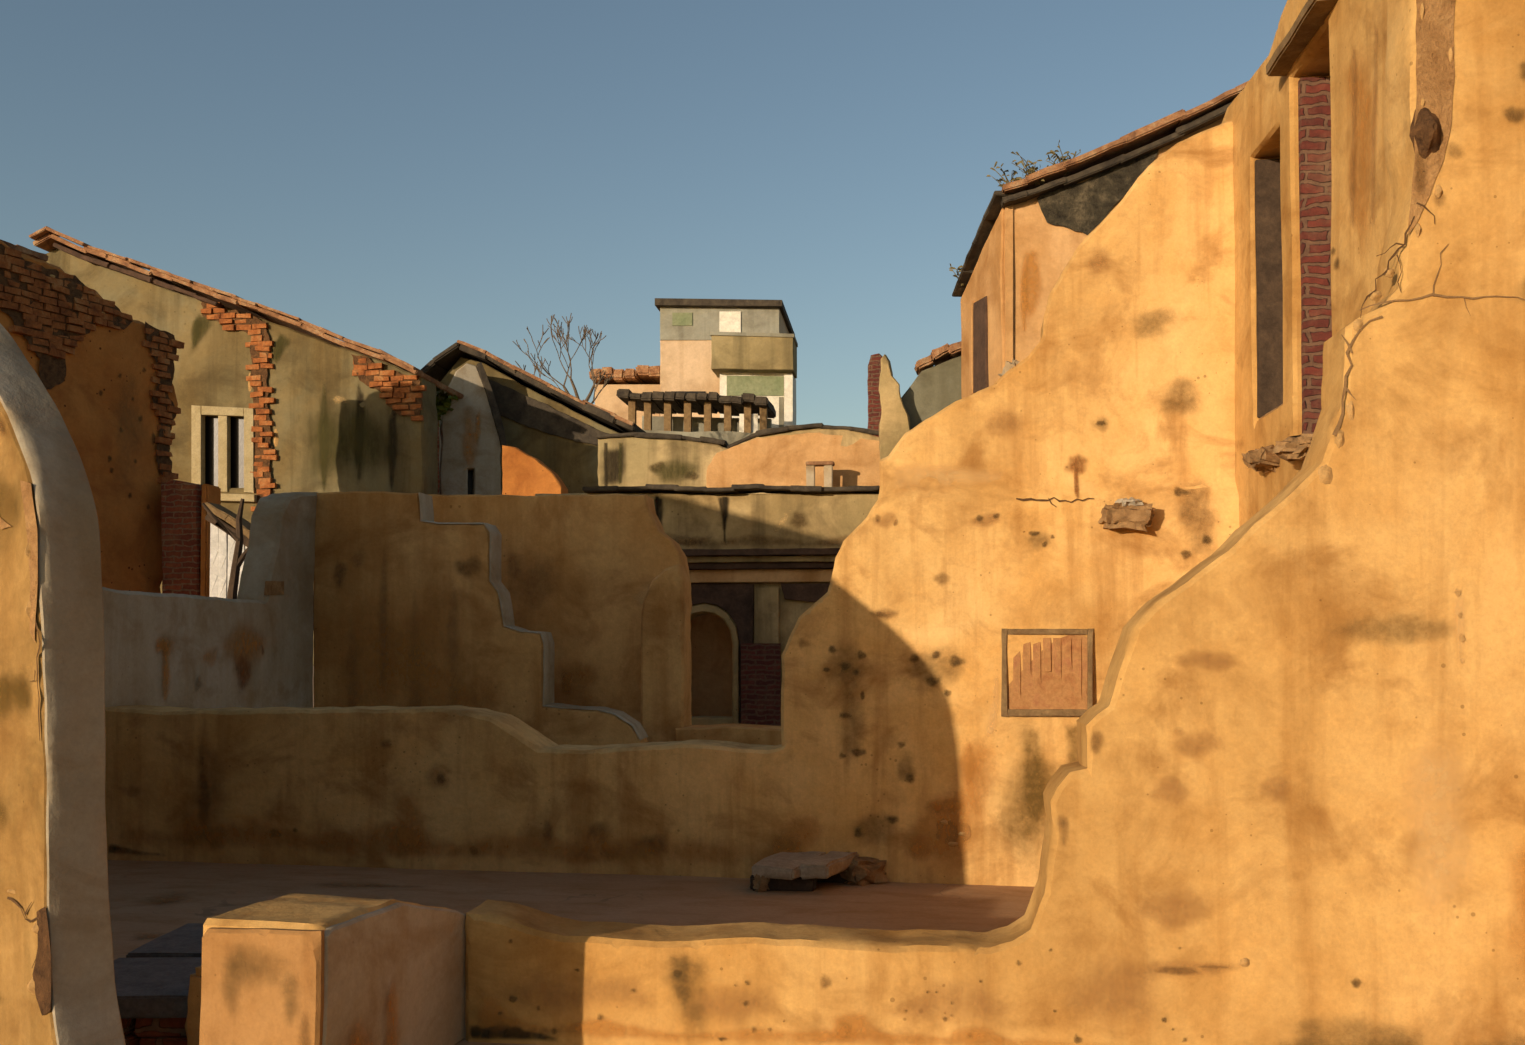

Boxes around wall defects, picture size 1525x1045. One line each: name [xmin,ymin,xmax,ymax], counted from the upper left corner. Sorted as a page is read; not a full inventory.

spalling [0,244,185,483]
spalling [201,302,279,512]
spalling [351,354,427,421]
crack [1016,497,1094,507]
crack [1318,171,1525,484]